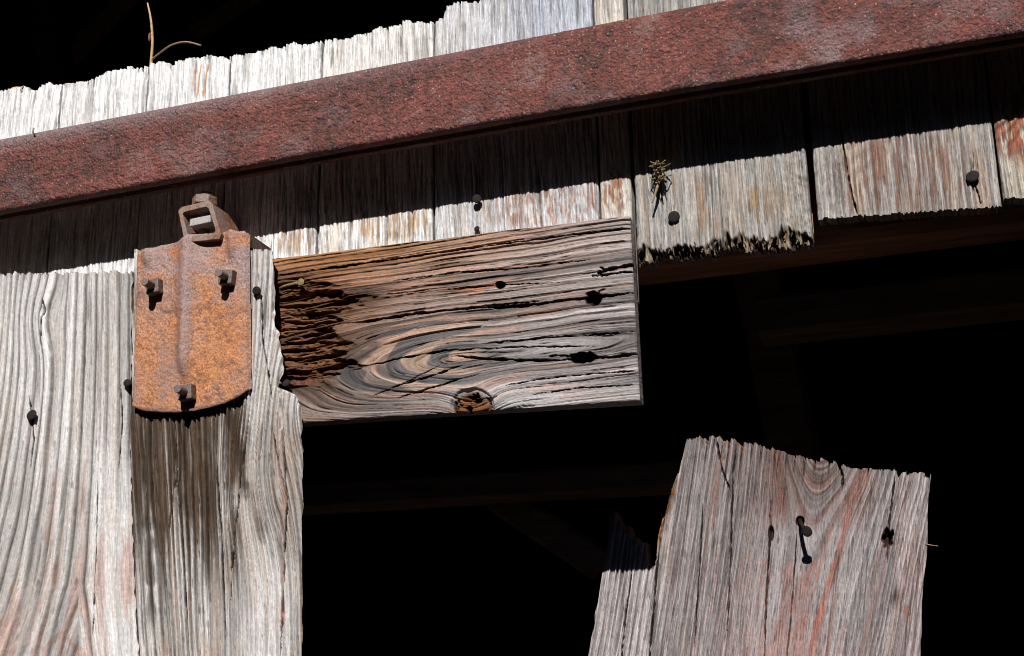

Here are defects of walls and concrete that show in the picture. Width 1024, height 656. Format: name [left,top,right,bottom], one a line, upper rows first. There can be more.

rust [995,95,1024,157]
rust [505,186,575,225]
rust [590,172,623,207]
rust [696,182,718,230]
rust [847,138,959,214]
crack [274,228,633,323]
crack [355,332,636,398]
crack [717,443,736,637]